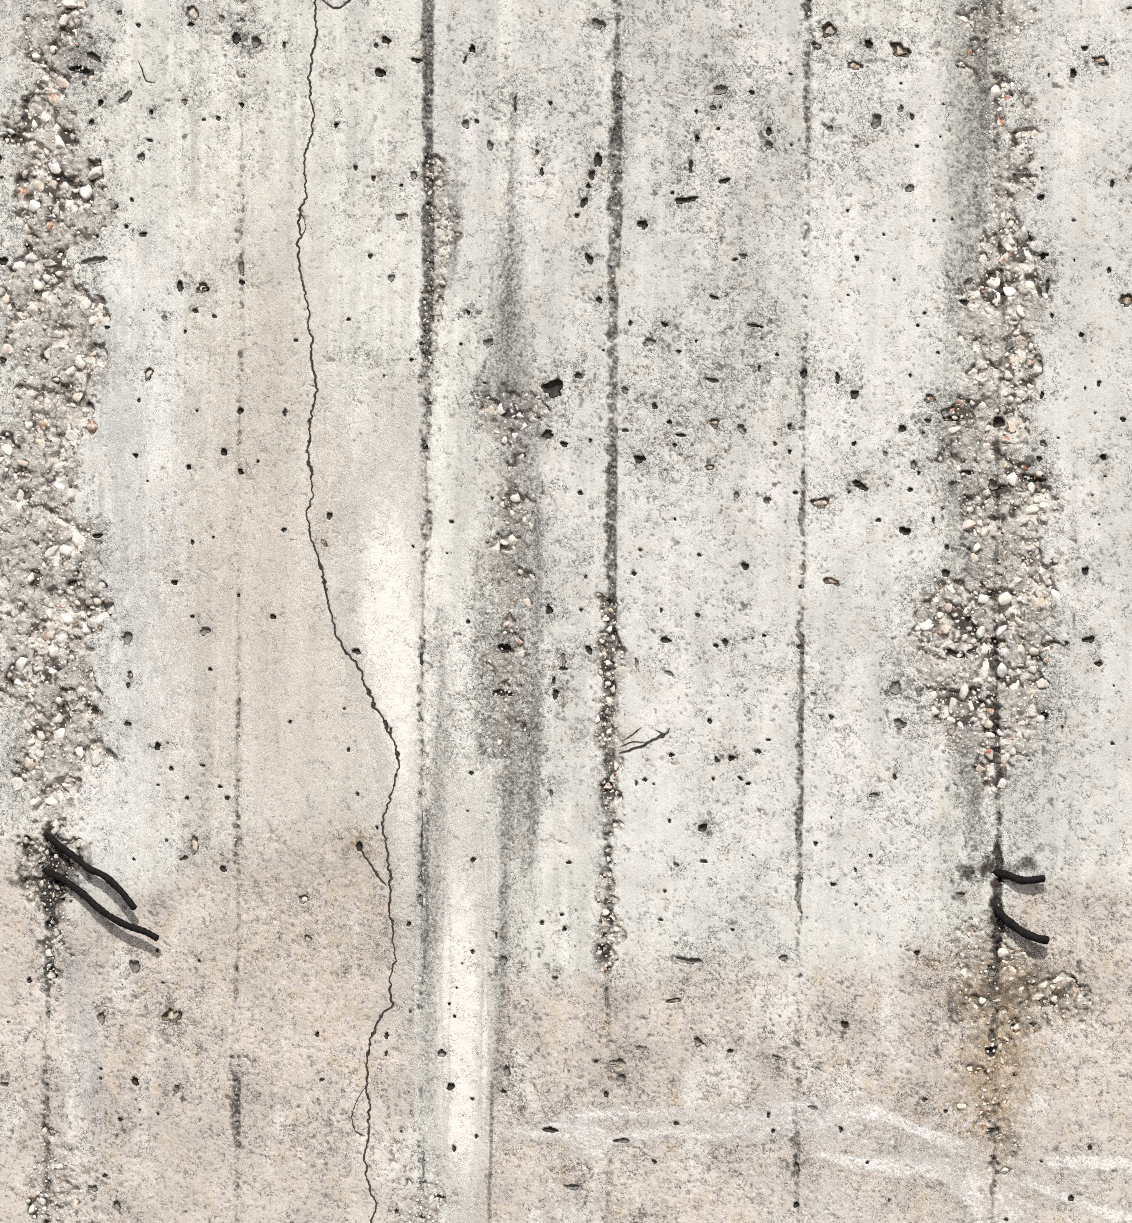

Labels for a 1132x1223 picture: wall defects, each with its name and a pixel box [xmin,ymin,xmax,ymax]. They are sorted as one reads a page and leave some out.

spalling [0,0,118,1011]
crack [296,0,400,1223]
spalling [904,0,1065,799]